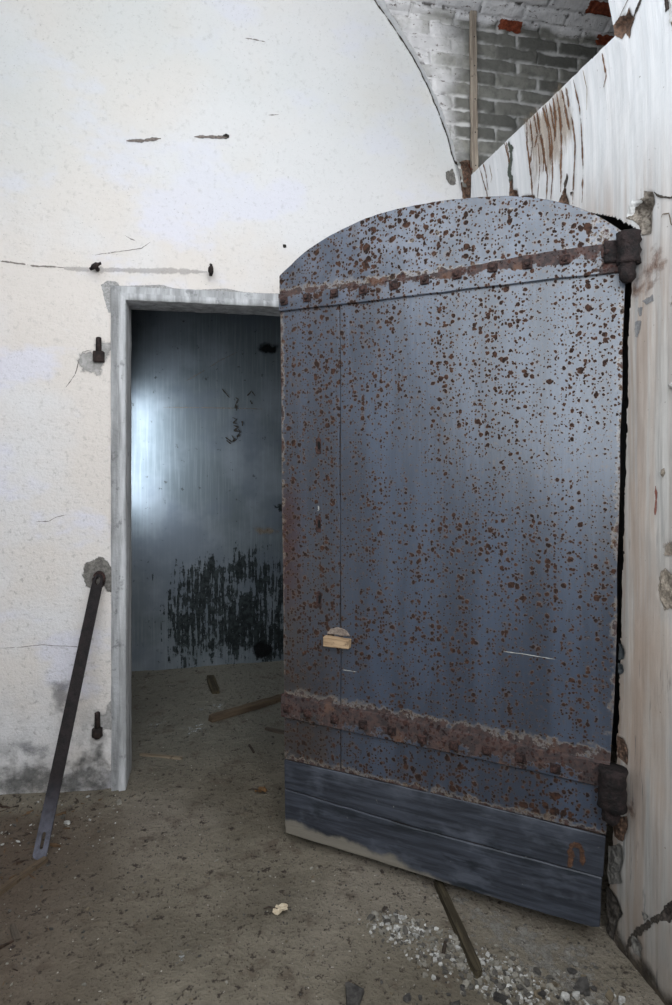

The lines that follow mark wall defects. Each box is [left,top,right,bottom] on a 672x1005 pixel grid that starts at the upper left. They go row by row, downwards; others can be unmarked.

crack [619,0,672,26]
corrosion [526,72,587,200]
spalling [626,191,655,235]
leakage [149,542,284,668]
spalling [658,568,672,610]
leakage [0,768,50,794]
leakage [61,750,105,792]
crack [625,900,672,957]